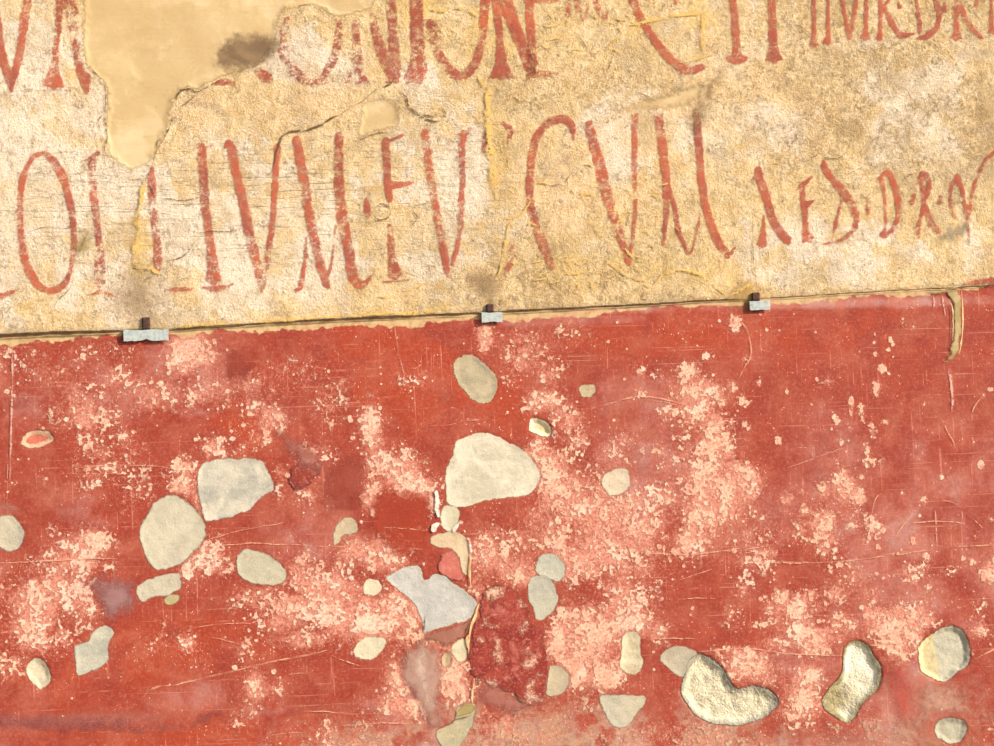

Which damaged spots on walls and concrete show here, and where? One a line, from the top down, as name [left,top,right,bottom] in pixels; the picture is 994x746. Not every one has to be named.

peeling [711,314,742,332]
peeling [0,348,46,398]
peeling [17,338,287,510]
peeling [267,355,444,532]
peeling [0,522,119,689]
peeling [146,622,196,654]
peeling [181,526,235,586]
peeling [226,534,543,746]
crack [465,547,531,654]
peeling [947,556,994,645]
spalling [934,696,994,745]